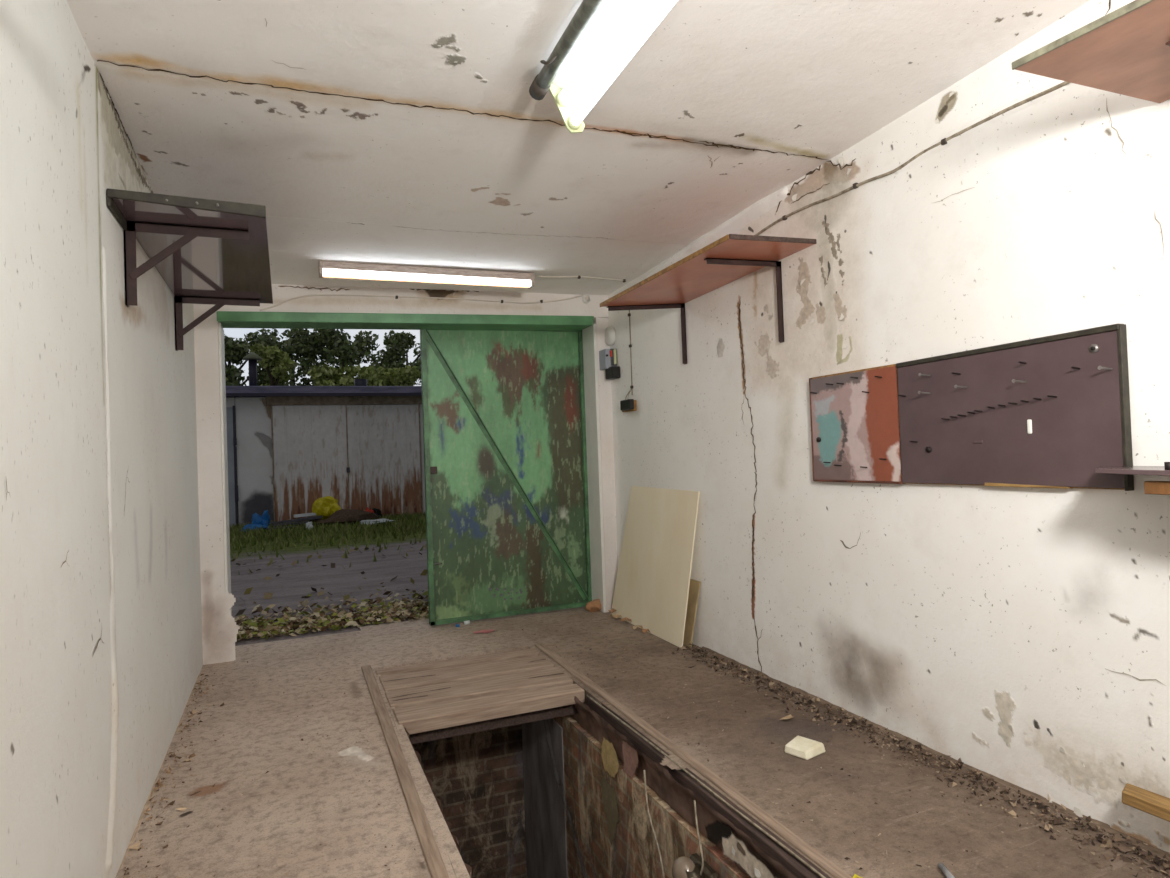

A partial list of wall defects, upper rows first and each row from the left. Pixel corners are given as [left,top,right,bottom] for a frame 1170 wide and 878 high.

peeling [225,91,379,121]
peeling [427,32,488,83]
crack [97,60,826,168]
water stain [117,27,811,169]
flaking render [776,157,855,212]
peeling [789,214,857,366]
crack [737,297,763,673]